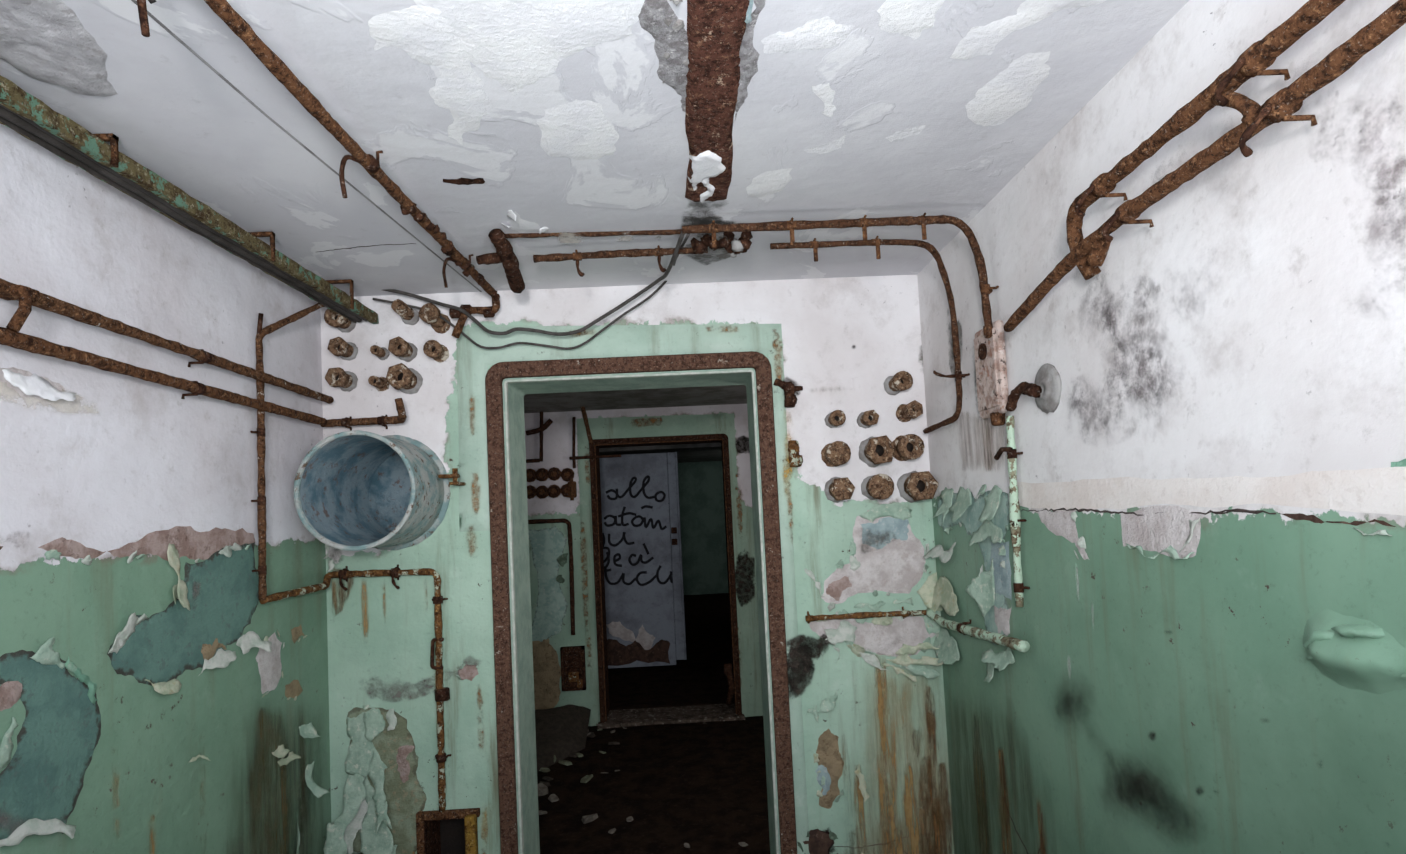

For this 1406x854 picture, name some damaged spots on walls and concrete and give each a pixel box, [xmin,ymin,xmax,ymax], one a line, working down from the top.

peeling [368,0,689,145]
peeling [0,367,76,402]
water stain [1114,304,1164,401]
peeling [38,526,307,701]
peeling [804,484,1015,683]
peeling [1028,508,1089,560]
peeling [1121,505,1201,560]
flaking render [1277,512,1404,536]
peeling [0,637,101,847]
peeling [272,705,427,854]
corrosion [855,667,951,854]
corrosion [973,728,1011,854]